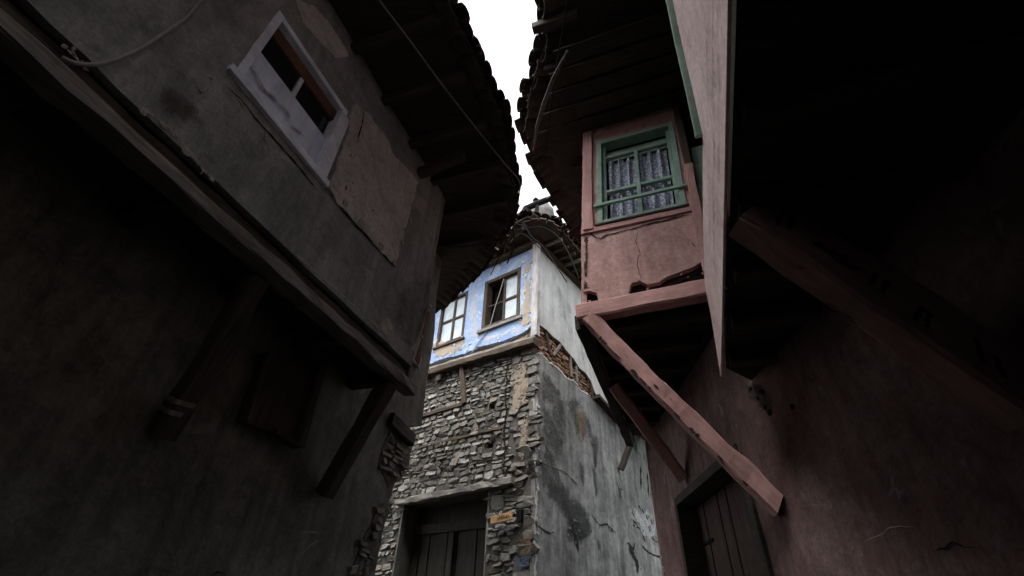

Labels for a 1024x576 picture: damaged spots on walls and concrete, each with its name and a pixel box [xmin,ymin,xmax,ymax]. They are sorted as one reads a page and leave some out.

crack [583,214,689,281]
spalling [671,269,704,286]
flaking render [297,253,601,576]
leakage [539,373,600,550]